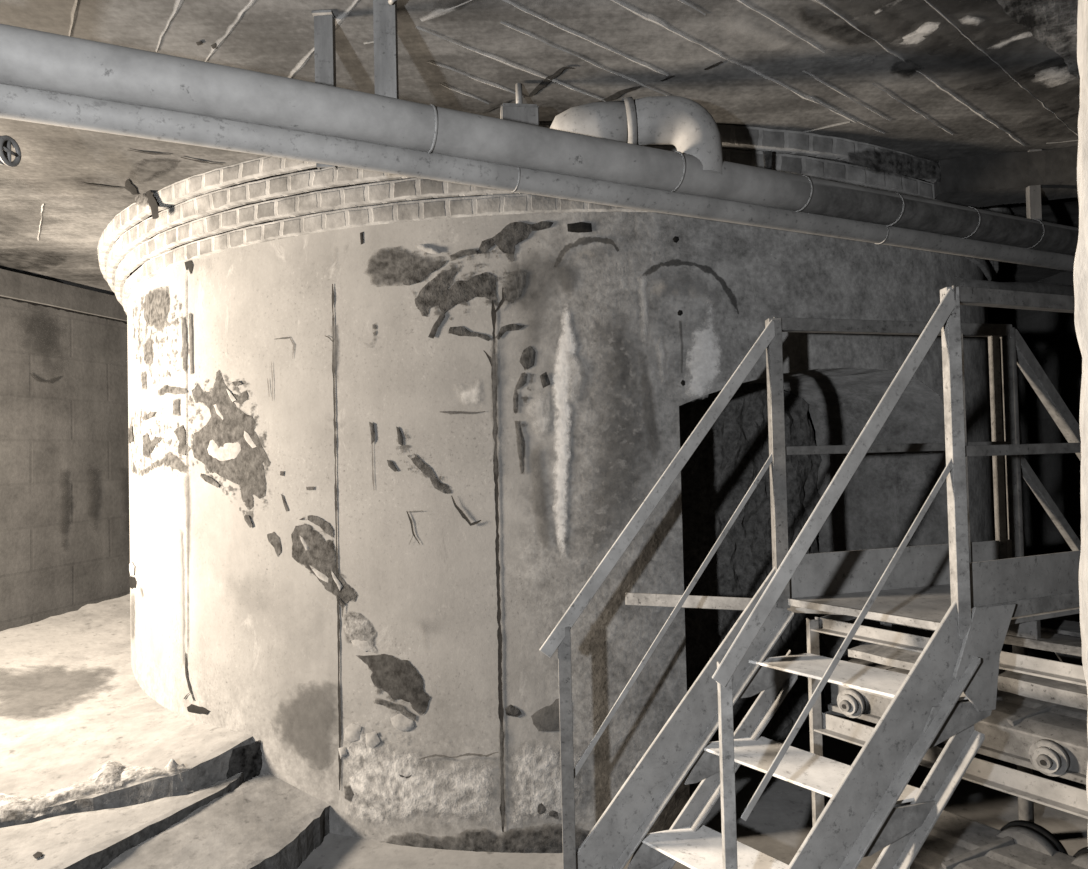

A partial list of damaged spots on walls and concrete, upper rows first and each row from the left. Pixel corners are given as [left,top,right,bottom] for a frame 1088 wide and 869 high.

damp [801,0,1080,138]
spalling [367,221,553,338]
spalling [567,222,592,233]
spalling [128,287,284,528]
damp [526,309,581,553]
damp [594,328,659,541]
spalling [267,515,430,731]
damp [0,667,112,718]
spalling [0,759,186,822]
damp [278,685,335,767]
flaking render [338,723,563,853]
flaking render [505,698,560,732]